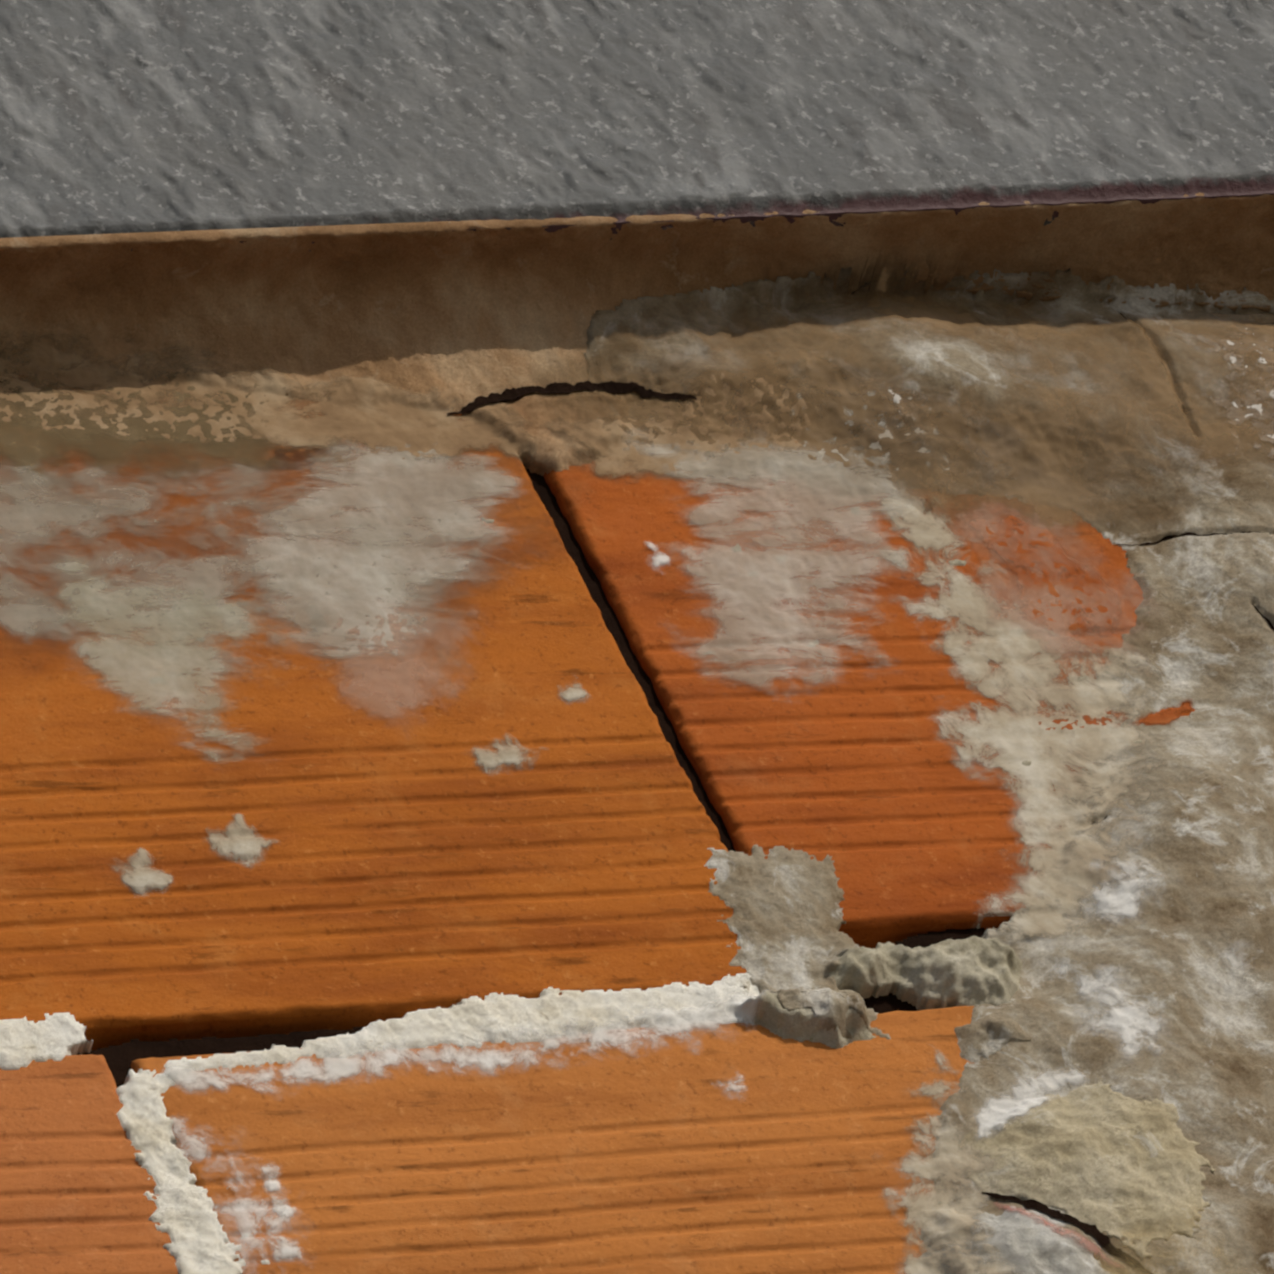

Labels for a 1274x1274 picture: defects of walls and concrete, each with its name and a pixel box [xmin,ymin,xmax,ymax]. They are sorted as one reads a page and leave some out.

crack [447,380,697,415]
leakage [0,369,387,646]
crack [1114,531,1271,546]
spalling [968,514,1121,637]
crack [1252,604,1274,630]
spalling [1039,700,1192,730]
efflorescence [166,995,759,1090]
efflorescence [174,1119,206,1159]
efflorescence [224,1172,284,1245]
crack [982,1192,1153,1274]